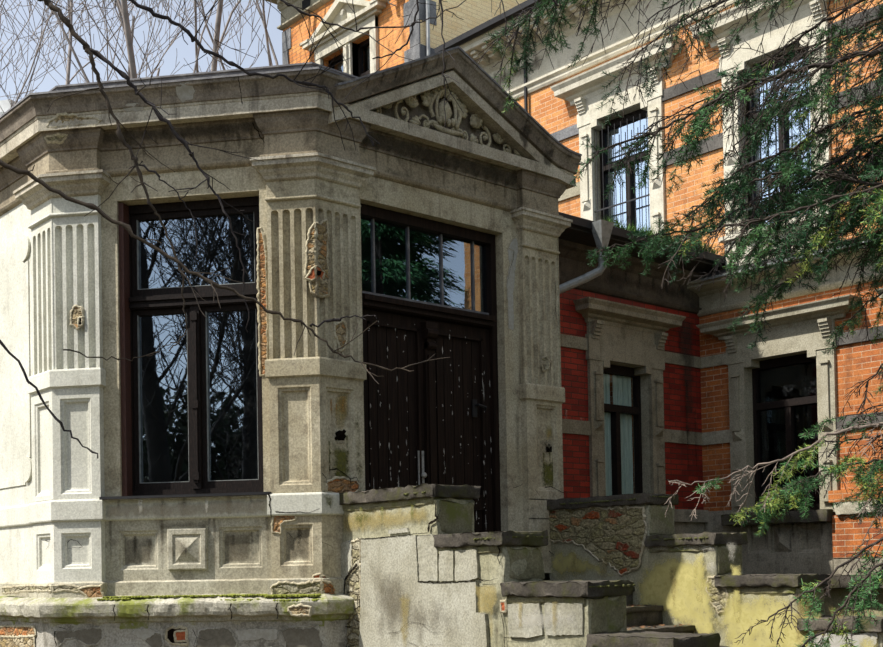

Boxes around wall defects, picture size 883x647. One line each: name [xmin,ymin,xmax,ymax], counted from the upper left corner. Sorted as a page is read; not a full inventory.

spalling [304,219,331,298]
spalling [70,305,85,330]
spalling [256,227,269,377]
spalling [325,428,416,493]
spalling [270,515,297,535]
spalling [549,505,647,577]
spalling [0,624,36,647]
peeling [53,626,106,646]
peeling [115,538,361,647]
leakage [639,555,840,647]